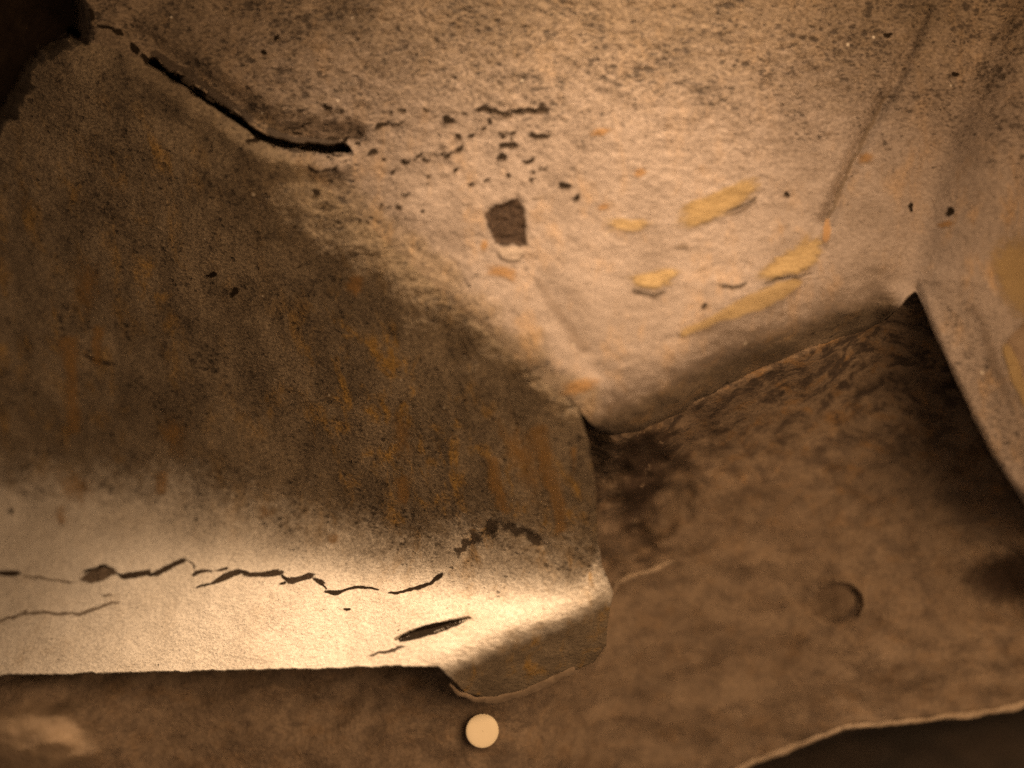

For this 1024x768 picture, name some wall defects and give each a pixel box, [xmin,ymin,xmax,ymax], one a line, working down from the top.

crack [89,7,551,224]
peeling [680,177,761,226]
spalling [481,196,543,280]
peeling [632,269,678,295]
peeling [759,219,831,285]
crack [0,558,444,622]